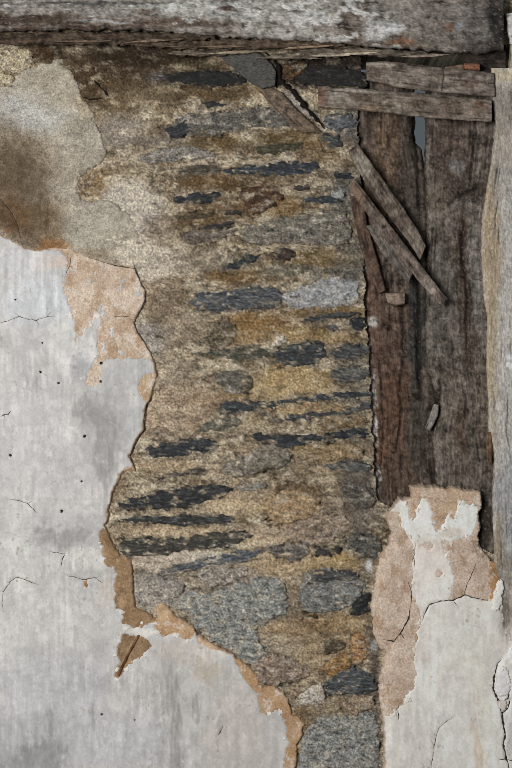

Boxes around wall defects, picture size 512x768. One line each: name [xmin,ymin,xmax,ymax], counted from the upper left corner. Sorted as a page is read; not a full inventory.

peeling [138,373,157,403]
peeling [98,528,220,682]
crack [383,545,484,642]
peeling [370,484,499,718]
peeling [233,655,305,768]
crack [492,657,512,768]